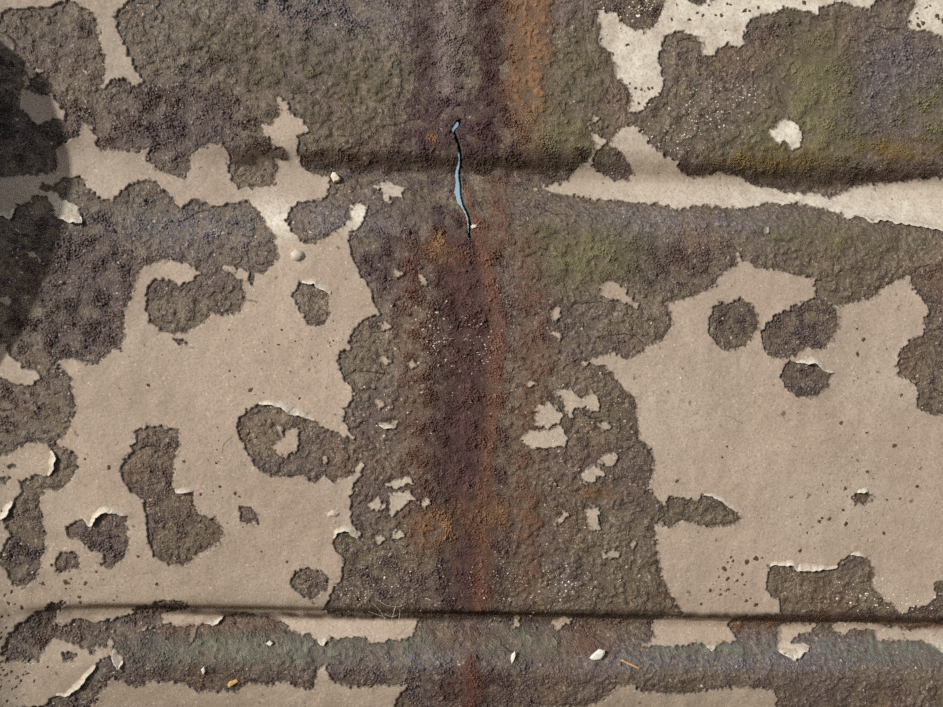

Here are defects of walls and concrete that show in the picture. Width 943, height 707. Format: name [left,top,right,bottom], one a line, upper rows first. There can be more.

crack [441,110,472,249]
rust [416,190,509,613]
peeling [0,0,943,415]
peeling [0,161,943,707]
rust [397,0,552,159]